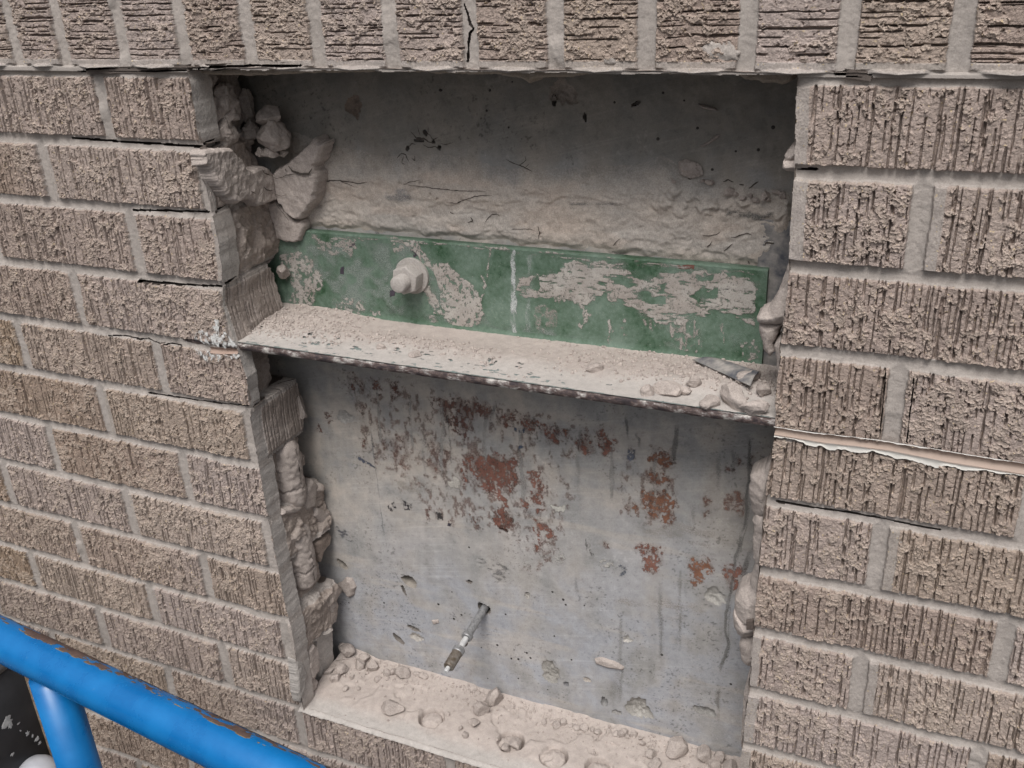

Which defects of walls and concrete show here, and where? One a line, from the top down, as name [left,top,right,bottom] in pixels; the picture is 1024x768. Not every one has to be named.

crack [464,5,474,60]
crack [81,137,221,148]
spalling [190,134,335,242]
rust [348,372,617,566]
rust [620,446,679,528]
crack [777,500,940,530]
rust [635,544,663,574]
rust [688,558,746,591]